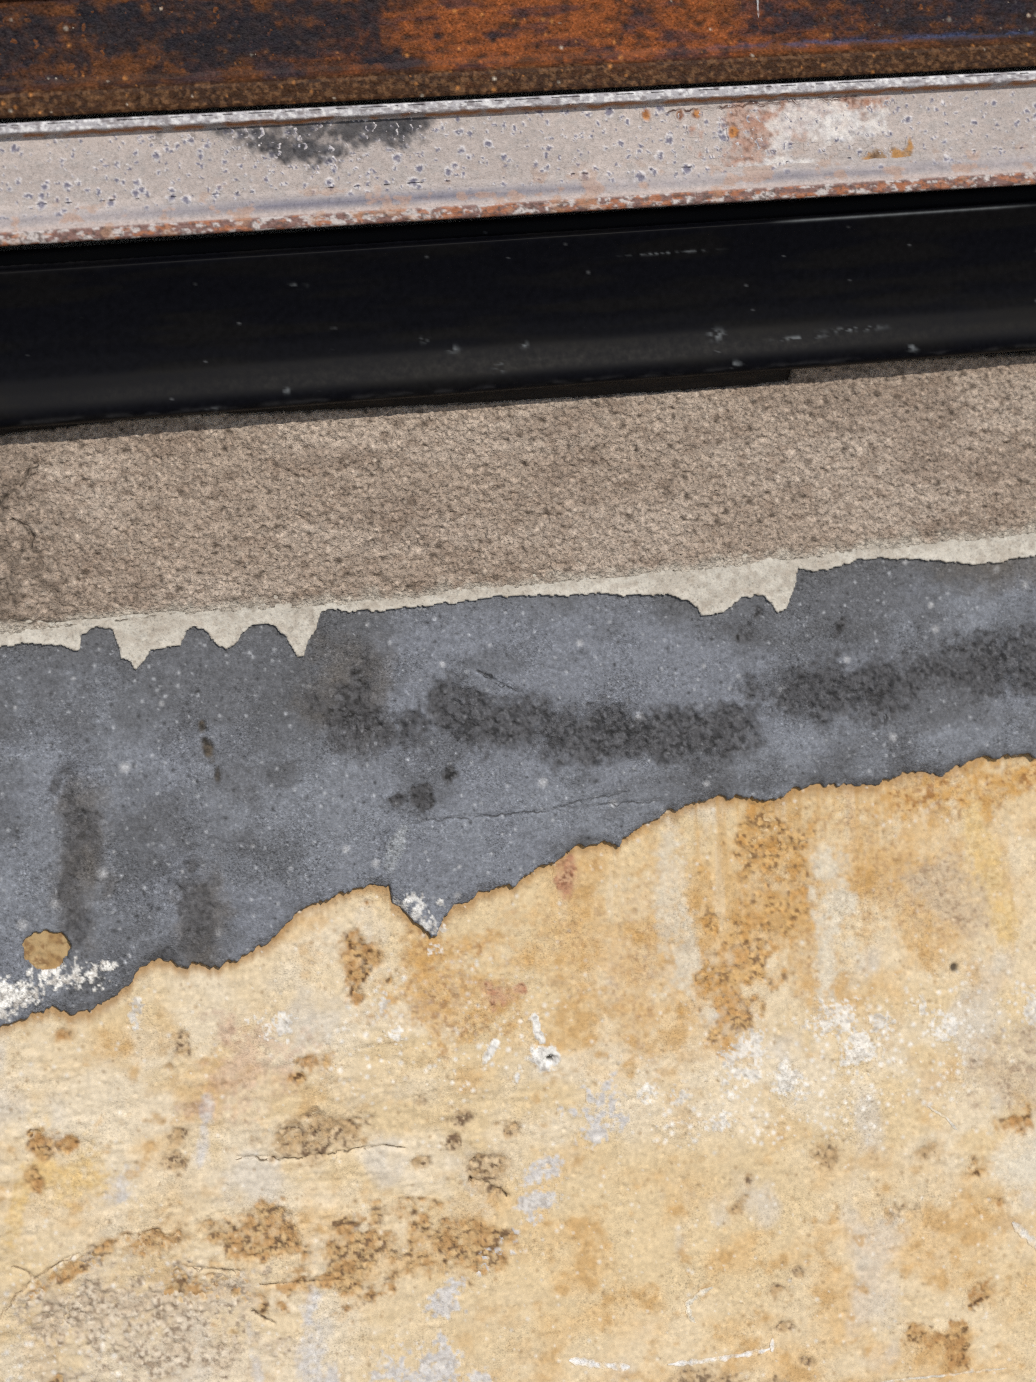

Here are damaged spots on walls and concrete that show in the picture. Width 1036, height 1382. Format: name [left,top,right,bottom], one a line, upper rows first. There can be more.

crack [0,464,39,547]
crack [0,612,175,626]
peeling [114,615,320,670]
peeling [684,579,796,647]
spalling [287,614,1036,825]
efflorescence [0,955,119,1024]
spalling [334,898,394,1009]
damp [645,809,701,1002]
damp [790,811,897,1074]
damp [911,994,962,1046]
damp [956,791,1024,956]
spalling [0,1094,537,1382]